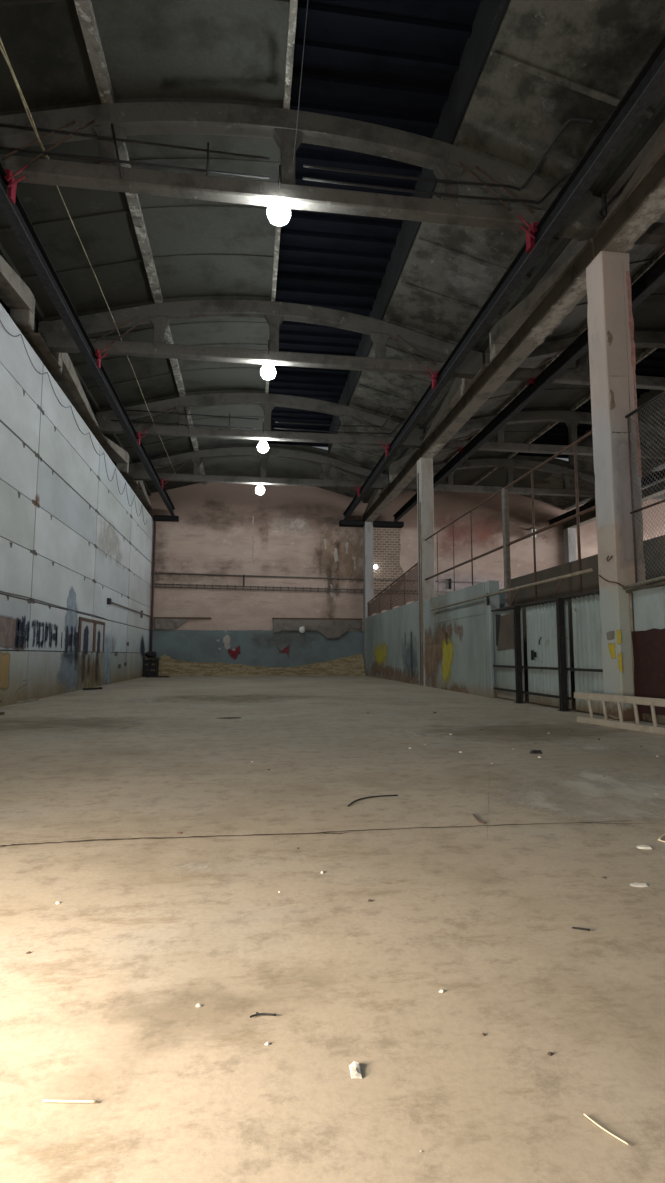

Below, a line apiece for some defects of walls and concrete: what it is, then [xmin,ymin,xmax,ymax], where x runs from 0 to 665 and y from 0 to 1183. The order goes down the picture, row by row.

rust [372,624,467,693]
crack [0,771,640,848]